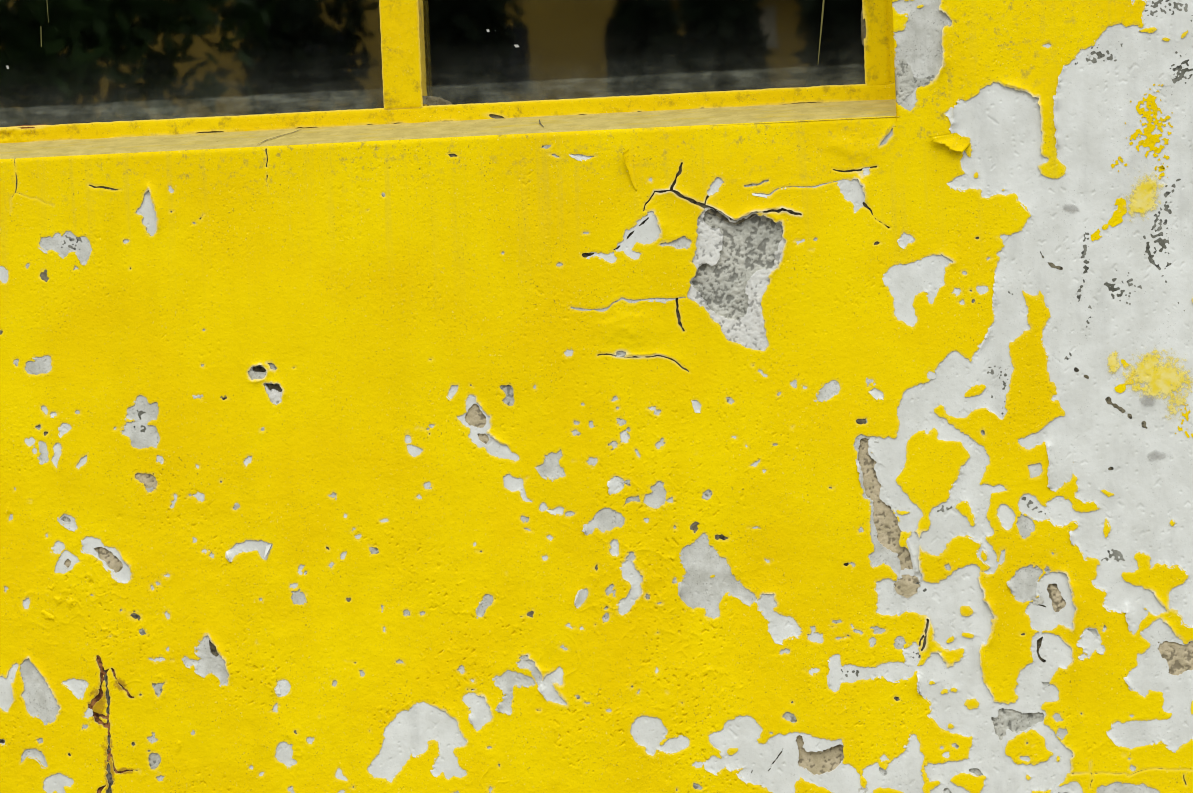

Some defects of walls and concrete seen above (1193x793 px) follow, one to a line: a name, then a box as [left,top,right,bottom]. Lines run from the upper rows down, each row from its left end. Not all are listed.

crack [644,162,877,224]
flaking render [582,177,818,351]
peeling [114,395,165,492]
flaking render [446,385,519,461]
crack [571,297,686,331]
crack [598,351,689,372]
peeling [672,0,1193,793]
peeling [582,476,673,623]
peeling [182,635,229,687]
peeling [0,658,93,793]
peeling [367,655,590,793]
peeling [630,715,689,756]